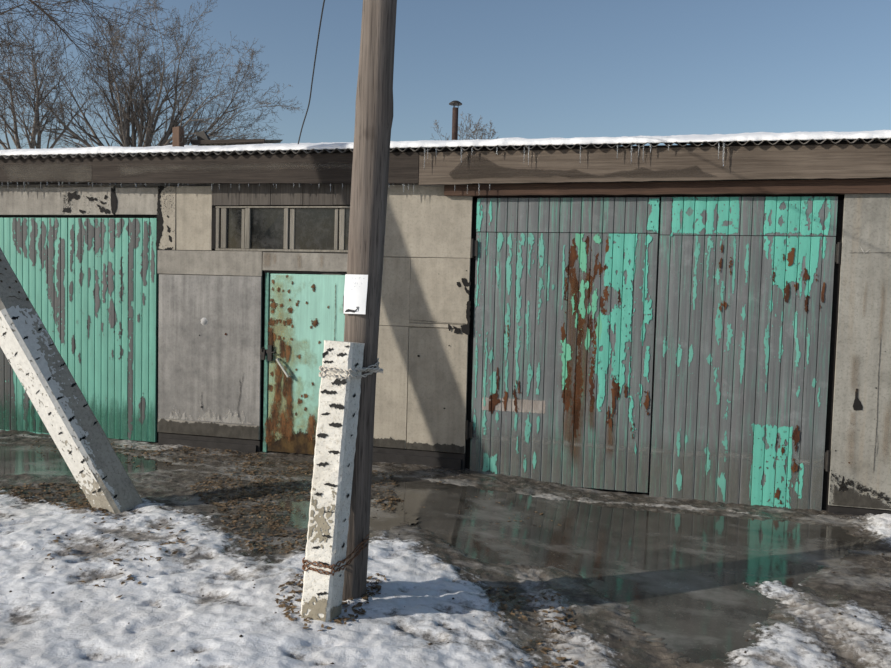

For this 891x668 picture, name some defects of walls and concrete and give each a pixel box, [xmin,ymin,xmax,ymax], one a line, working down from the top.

peeling [0,185,174,512]
corrosion [264,275,317,455]
peeling [514,412,540,472]
peeling [448,198,659,454]
corrosion [559,235,621,455]
corrosion [606,375,628,450]
peeling [670,197,749,383]
peeling [704,444,726,501]
peeling [749,423,804,509]
corrosion [783,247,795,266]
peeling [763,197,831,392]
corrosion [772,268,825,312]